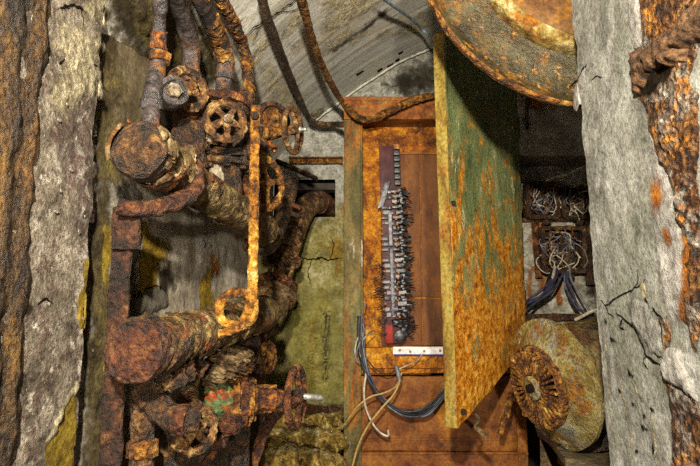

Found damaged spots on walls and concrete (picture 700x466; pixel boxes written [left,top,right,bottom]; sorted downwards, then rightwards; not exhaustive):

leakage [381,62,434,97]
spalling [627,0,700,49]
rust [628,1,700,101]
spalling [640,42,700,354]
crack [300,238,342,284]
crack [600,270,663,369]